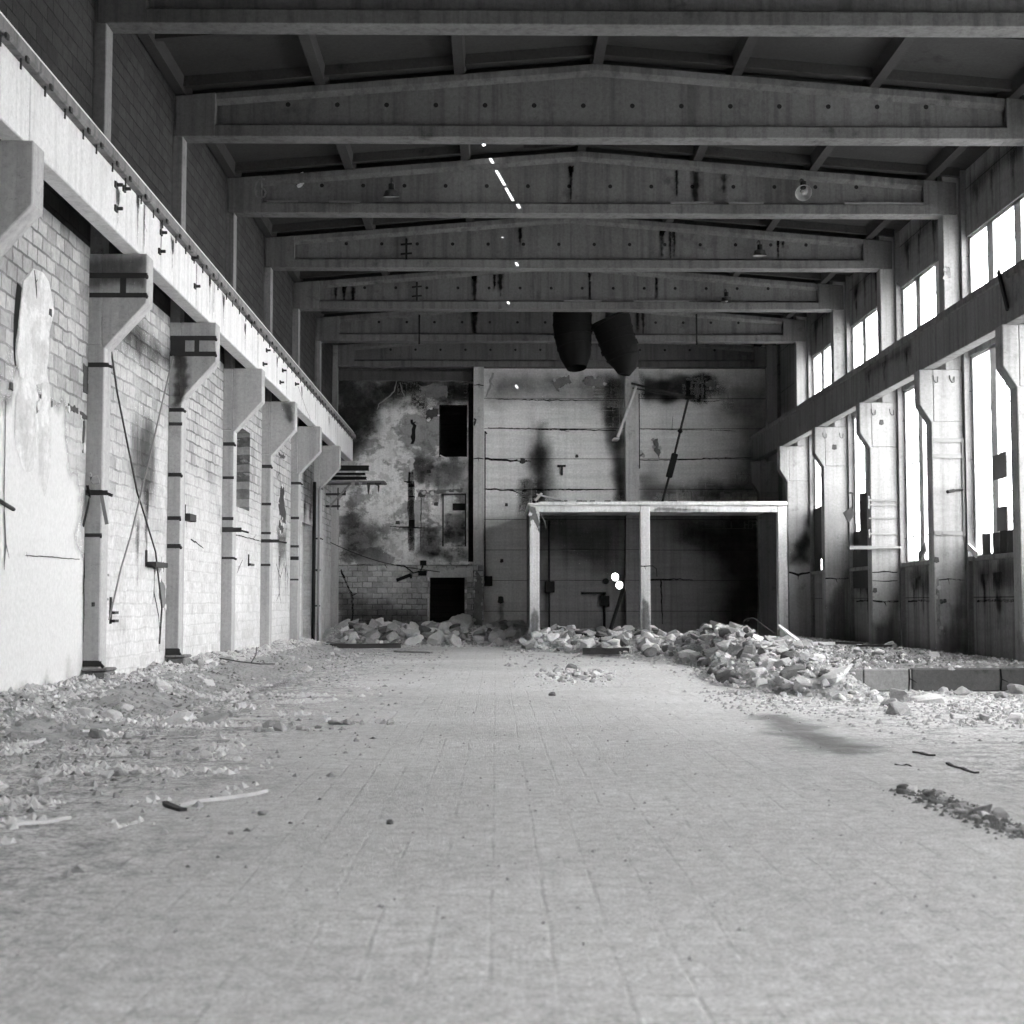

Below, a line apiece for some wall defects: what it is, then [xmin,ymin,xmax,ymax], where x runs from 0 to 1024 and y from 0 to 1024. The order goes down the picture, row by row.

leakage [660,231,675,259]
leakage [124,324,188,407]
leakage [338,381,473,455]
leakage [414,458,462,487]
crack [473,455,530,463]
leakage [341,514,376,559]
leakage [410,514,467,559]